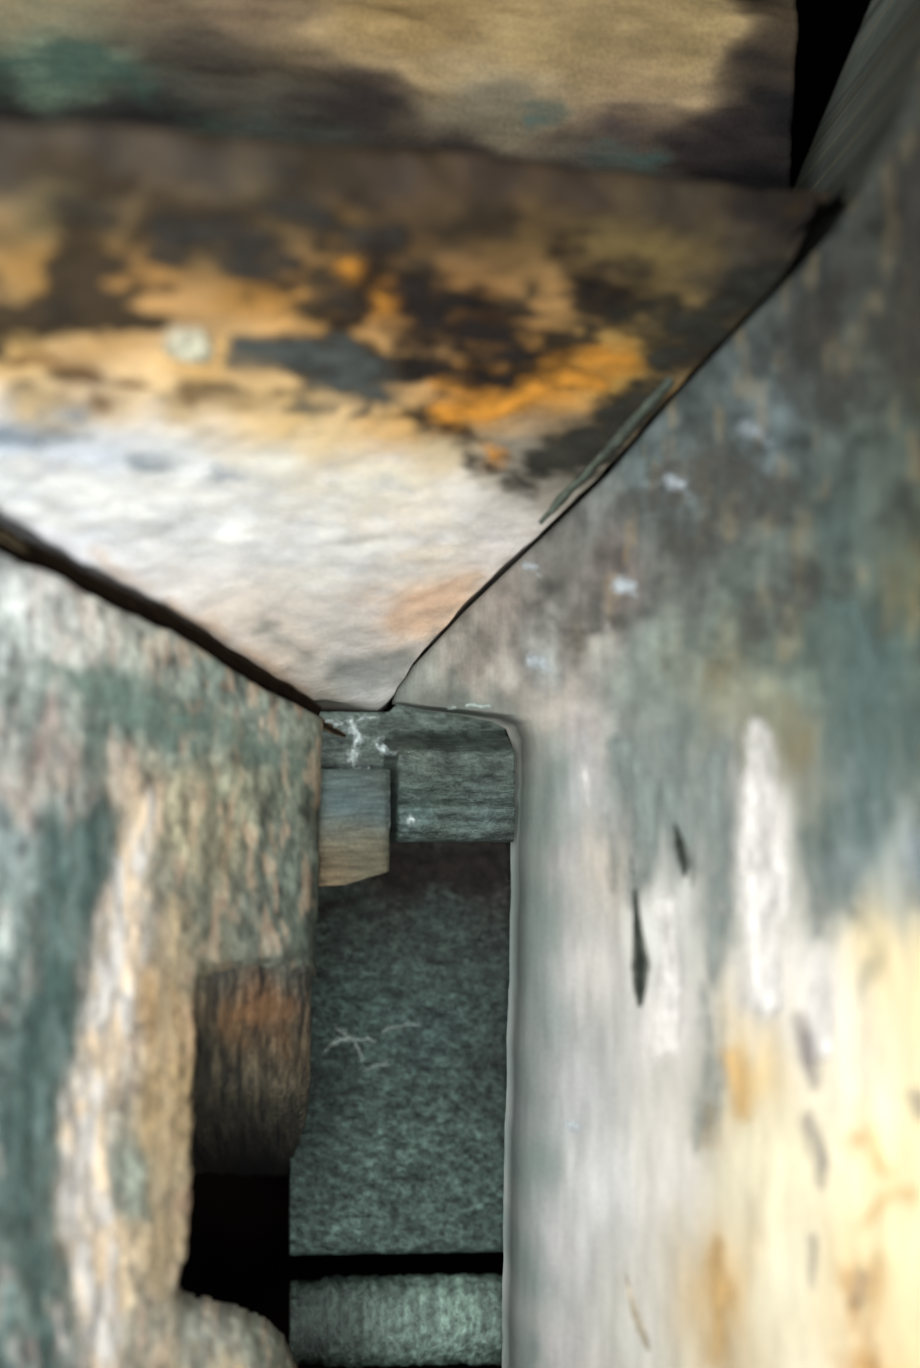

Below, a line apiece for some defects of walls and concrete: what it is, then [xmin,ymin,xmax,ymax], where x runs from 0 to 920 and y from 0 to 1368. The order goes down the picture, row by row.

damp [146,213,304,293]
corrosion [340,261,389,313]
damp [227,197,565,414]
corrosion [15,352,100,378]
corrosion [430,347,636,422]
damp [404,260,787,497]
damp [0,426,54,445]